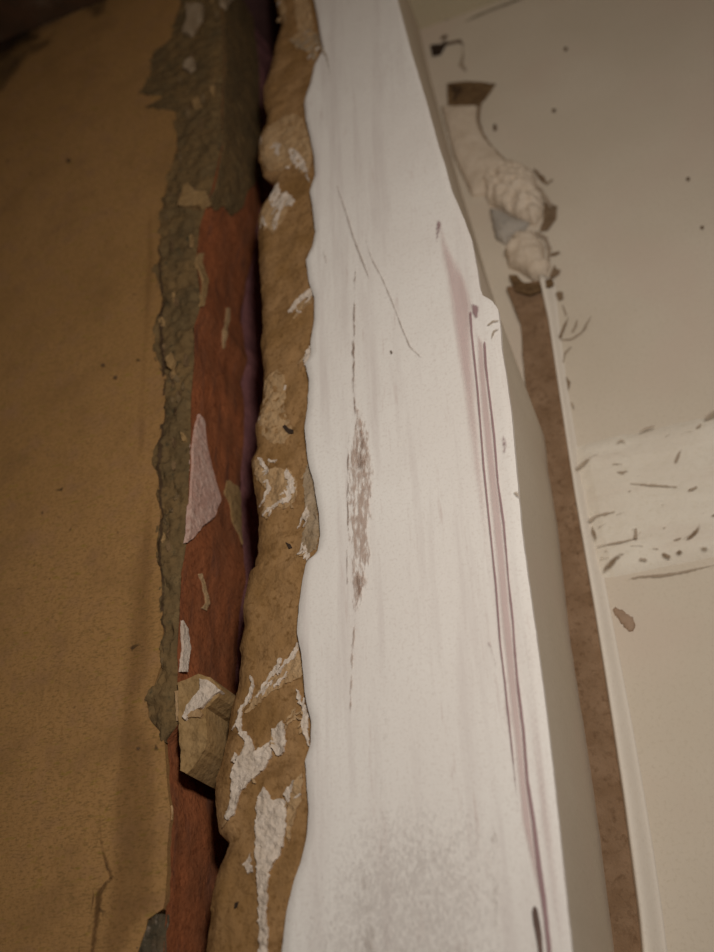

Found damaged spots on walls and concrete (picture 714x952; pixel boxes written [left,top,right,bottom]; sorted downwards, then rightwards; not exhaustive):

water stain [0,0,103,53]
spalling [430,35,496,106]
spalling [509,169,591,362]
spalling [136,0,323,952]